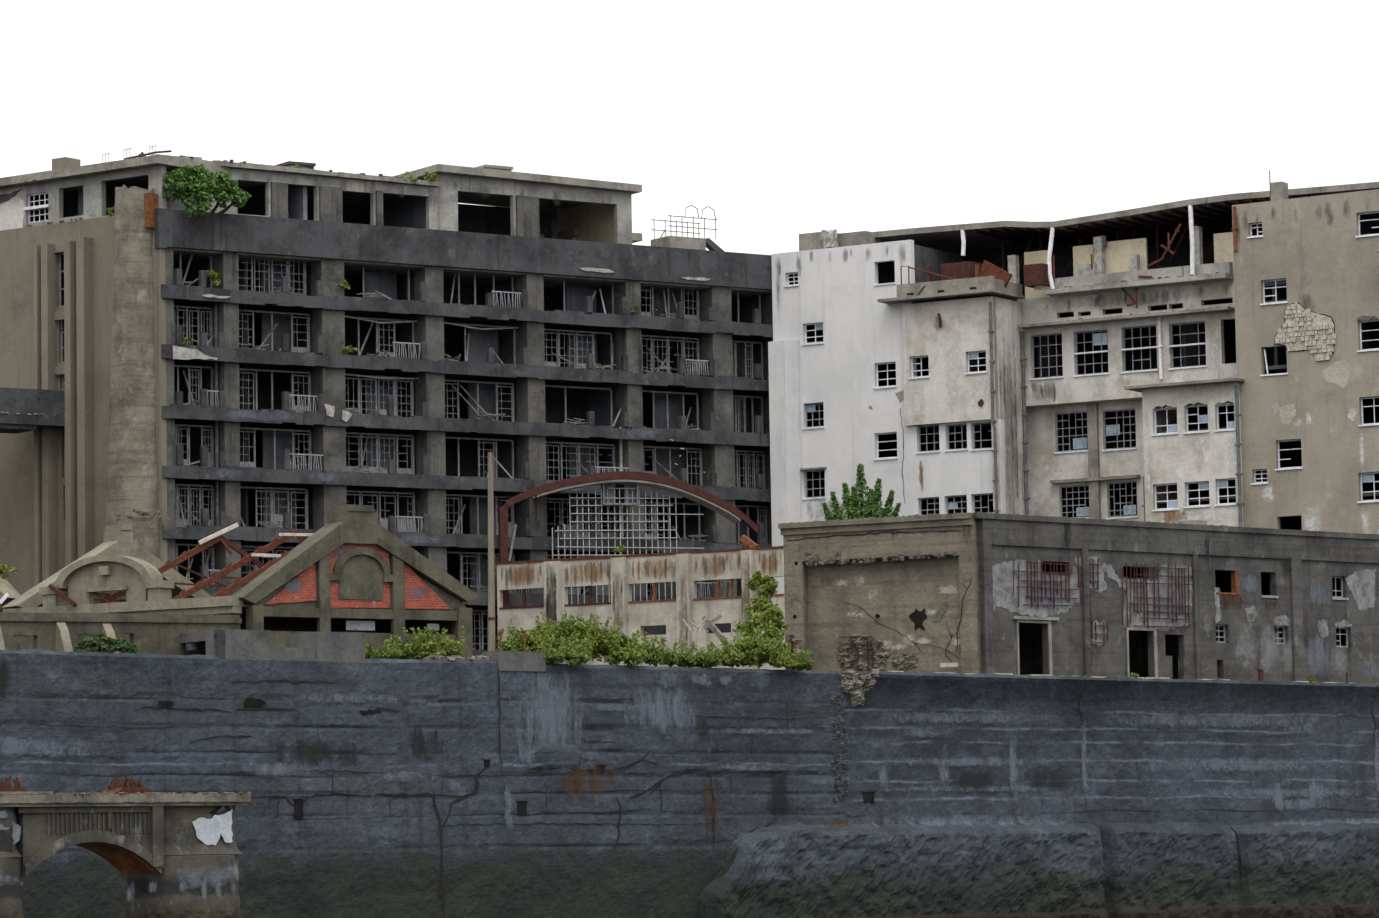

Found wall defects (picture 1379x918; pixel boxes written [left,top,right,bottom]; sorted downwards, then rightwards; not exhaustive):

spalling [1274,302,1350,388]
rust [695,556,740,576]
rust [759,555,777,572]
spalling [804,551,877,617]
spalling [992,556,1193,646]
spalling [1317,569,1376,639]
spalling [829,585,958,801]
crack [142,666,828,918]
peeling [0,811,21,853]
rust [75,842,159,875]
peeling [192,806,233,846]